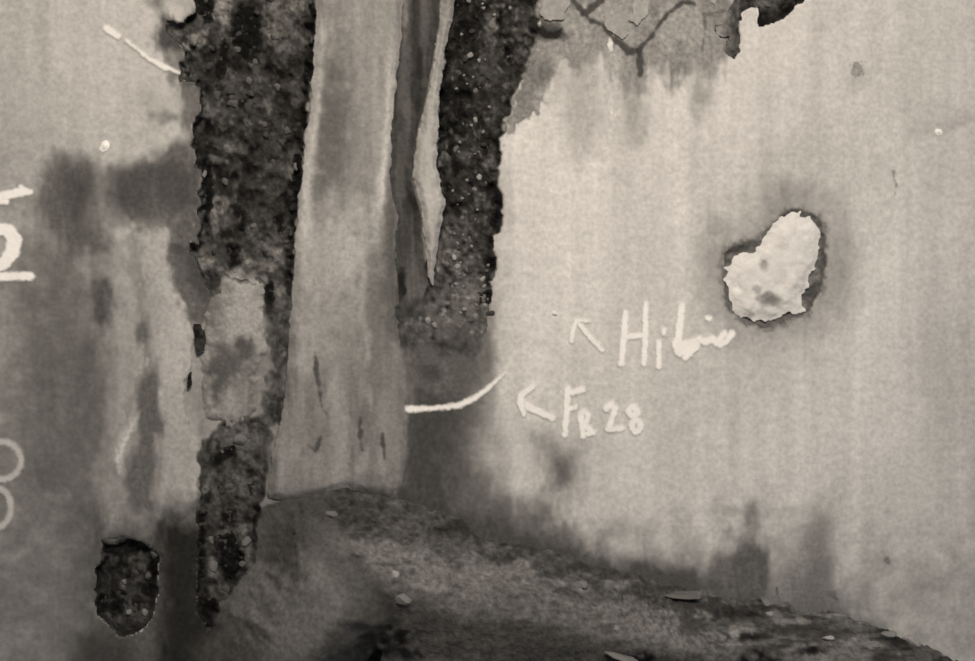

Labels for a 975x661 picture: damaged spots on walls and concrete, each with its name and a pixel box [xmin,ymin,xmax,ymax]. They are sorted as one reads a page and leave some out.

crack [527,16,562,38]
crack [572,0,725,76]
water stain [41,134,202,251]
spalling [395,0,804,350]